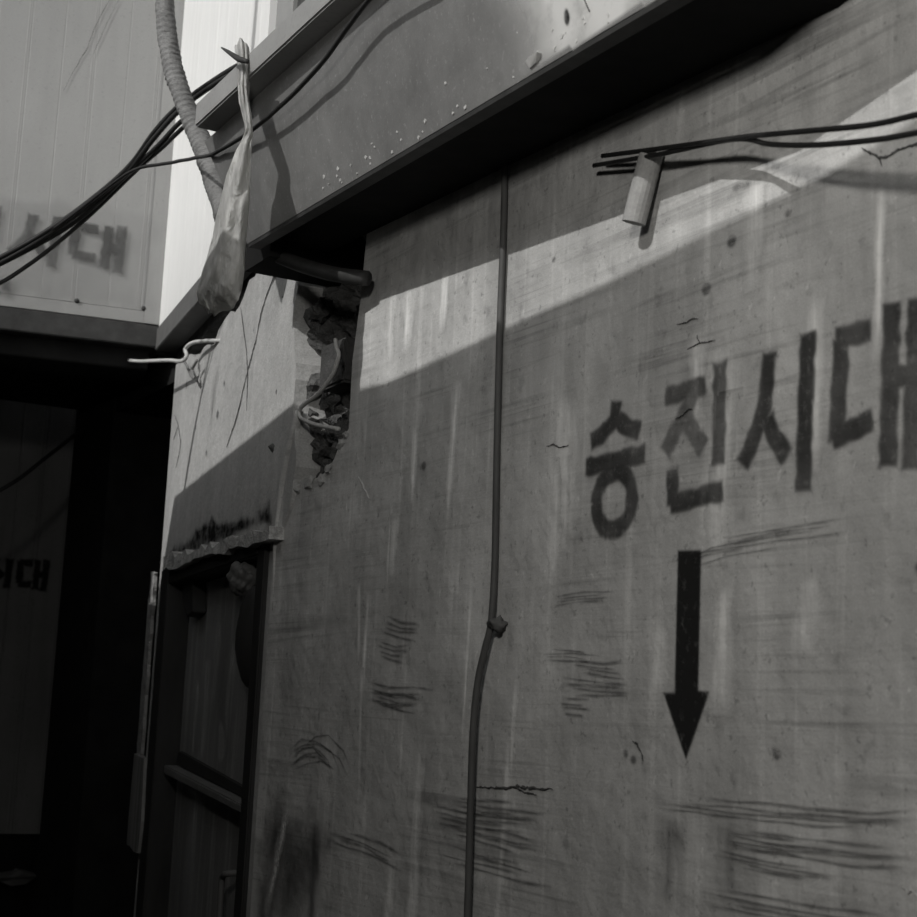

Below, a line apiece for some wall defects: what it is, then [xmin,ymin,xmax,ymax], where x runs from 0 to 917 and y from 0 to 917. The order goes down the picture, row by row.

crack [861,142,917,166]
spalling [293,283,362,495]
crack [479,784,552,795]